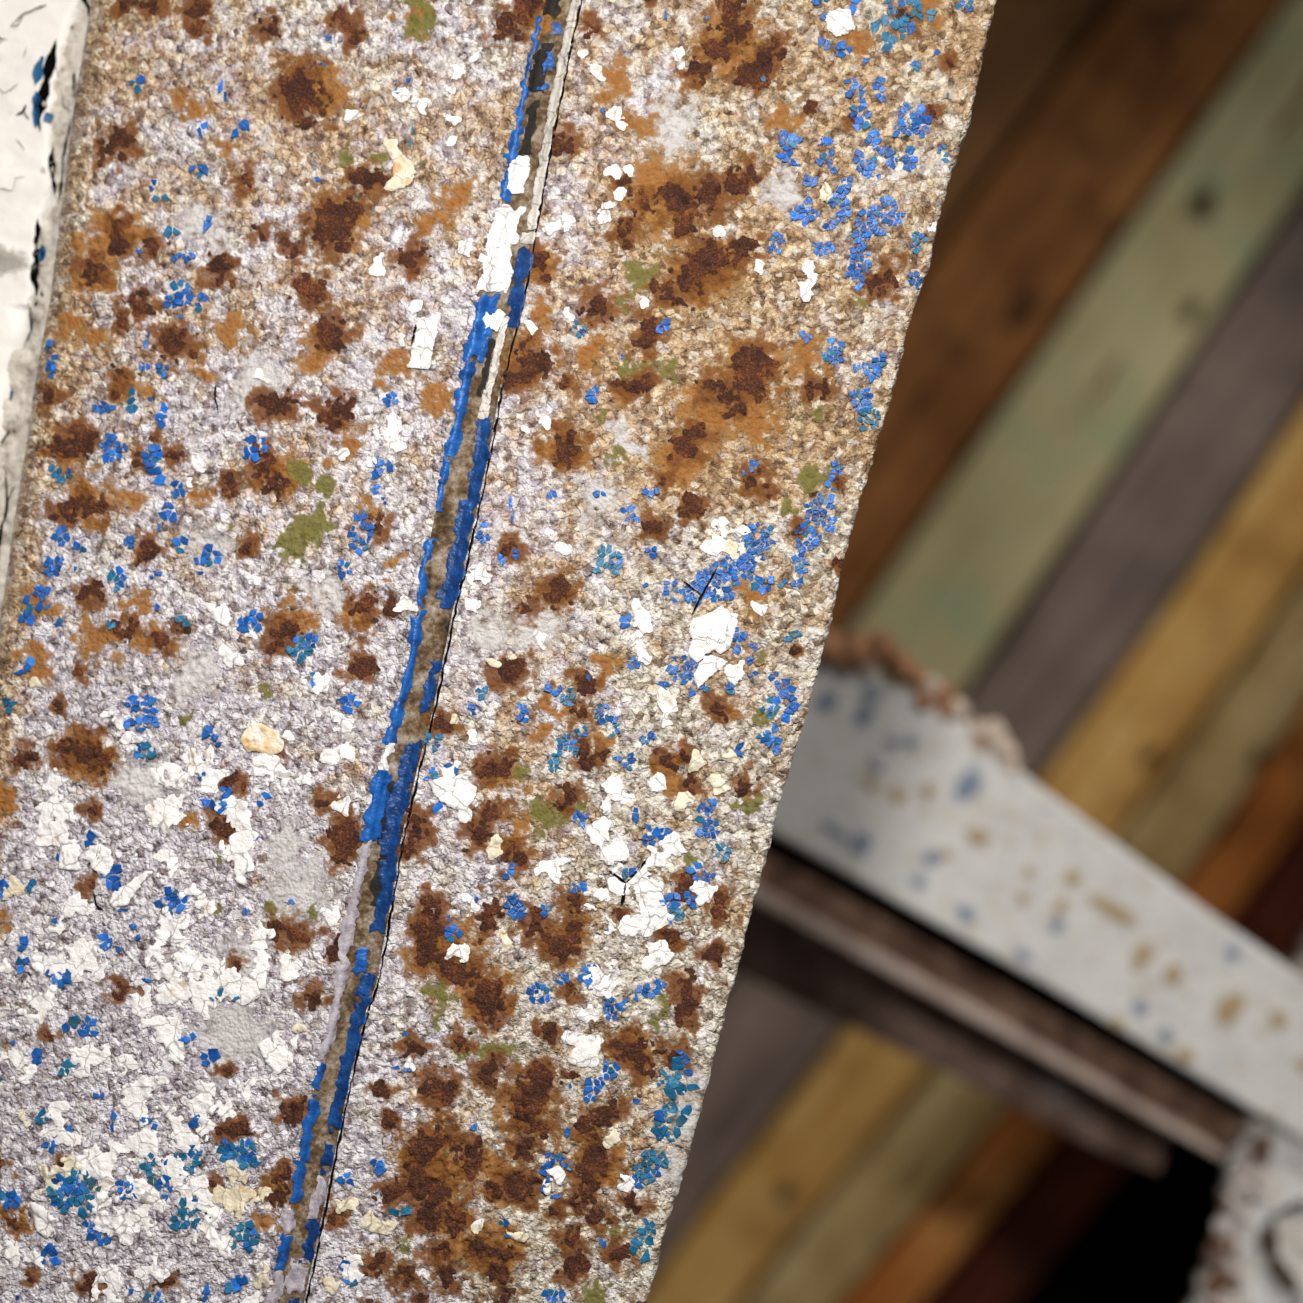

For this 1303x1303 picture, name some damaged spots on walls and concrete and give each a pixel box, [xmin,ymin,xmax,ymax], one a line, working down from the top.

crack [0,388,15,544]
crack [0,5,75,346]
corrosion [209,133,257,206]
corrosion [178,158,393,508]
corrosion [373,340,460,418]
peeling [600,106,628,131]
corrosion [480,0,840,542]
corrosion [0,575,196,827]
peeling [0,0,606,1303]
crack [306,0,582,1303]
corrosion [359,648,749,1303]
peeling [603,1129,620,1149]